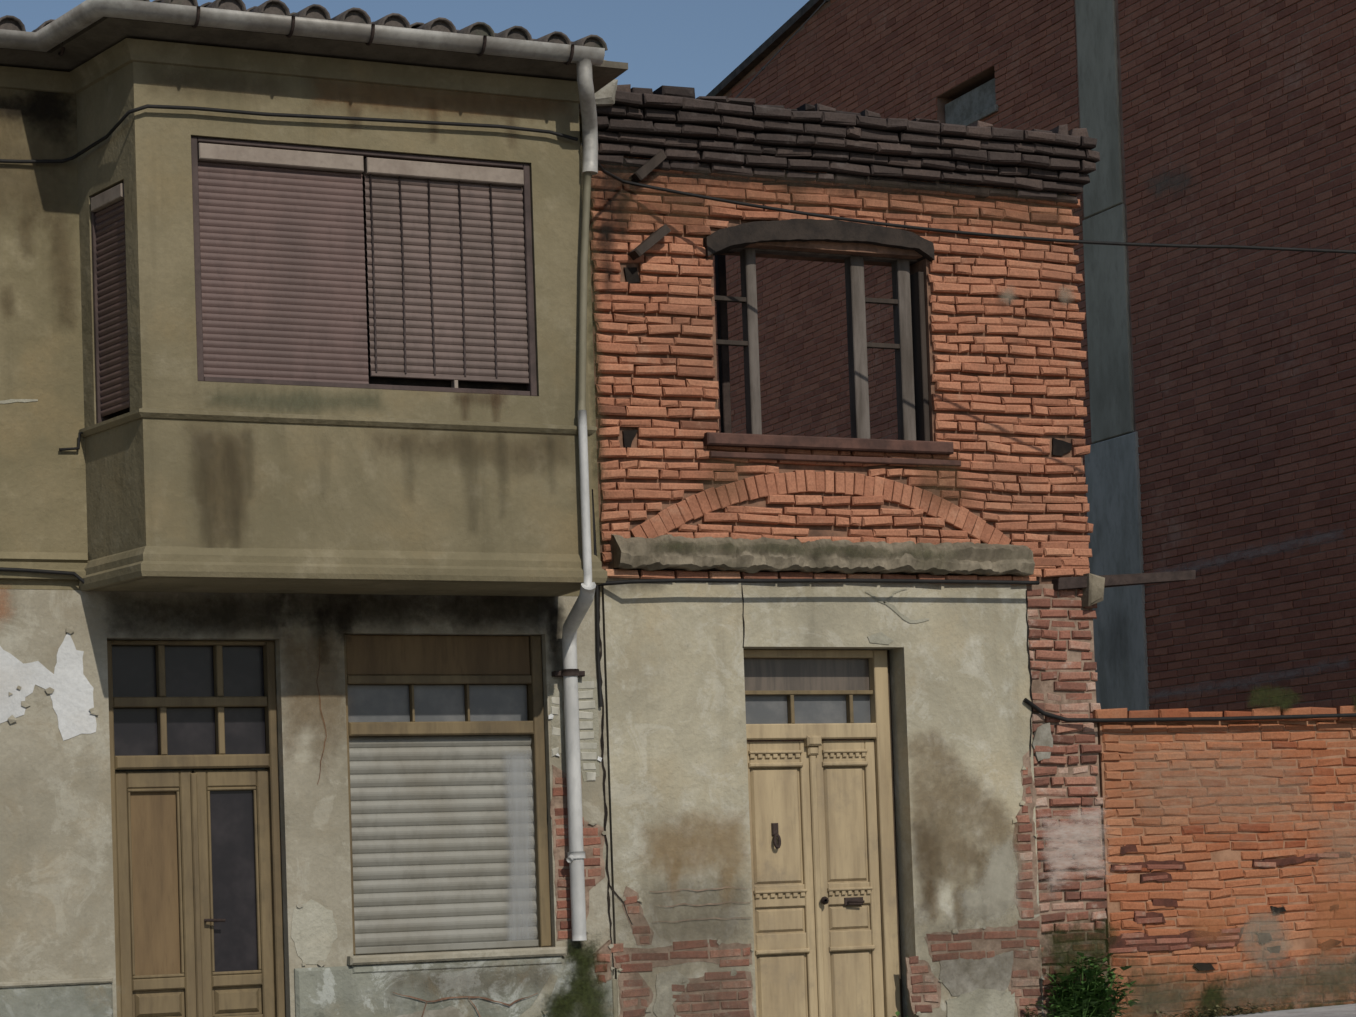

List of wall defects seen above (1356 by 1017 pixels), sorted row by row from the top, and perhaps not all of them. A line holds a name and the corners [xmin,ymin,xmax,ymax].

peeling [0,626,99,741]
crack [316,644,327,784]
spalling [548,674,607,941]
peeling [519,974,558,1017]
spalling [594,886,755,1017]
spalling [905,746,1186,1017]
spalling [1106,898,1244,954]